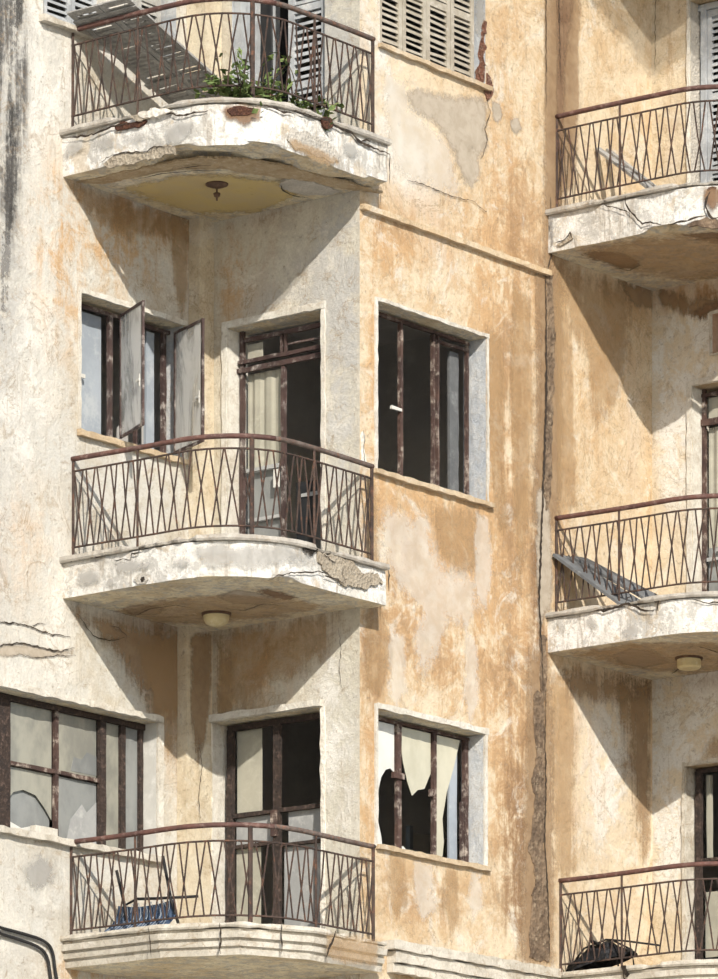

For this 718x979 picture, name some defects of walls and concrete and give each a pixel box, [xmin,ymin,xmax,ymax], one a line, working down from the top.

flaking render [402,0,522,187]
crack [61,123,127,138]
crack [166,110,207,118]
corrosion [224,104,261,125]
water stain [0,107,18,311]
crack [603,192,718,225]
spalling [685,217,718,244]
water stain [622,282,718,319]
peeling [197,543,390,590]
flaking render [0,642,74,659]
water stain [76,607,178,720]
water stain [190,633,212,764]